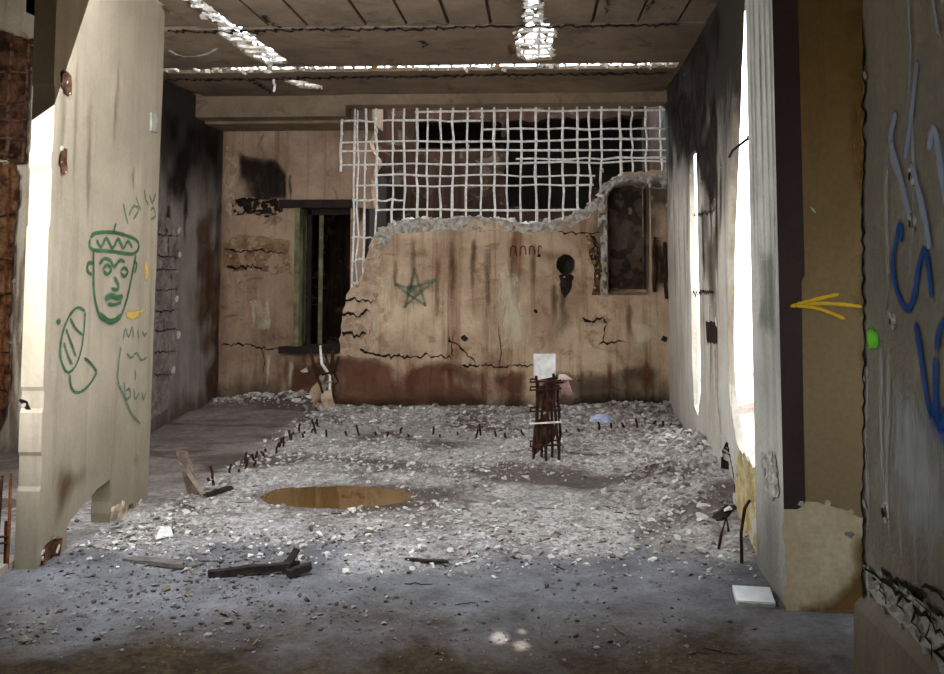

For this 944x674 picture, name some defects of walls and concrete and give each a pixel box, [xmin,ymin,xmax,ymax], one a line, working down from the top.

spalling [0,30,33,428]
leakage [167,117,218,196]
leakage [198,207,222,403]
leakage [240,156,284,204]
spalling [339,106,668,357]
crack [860,19,944,674]